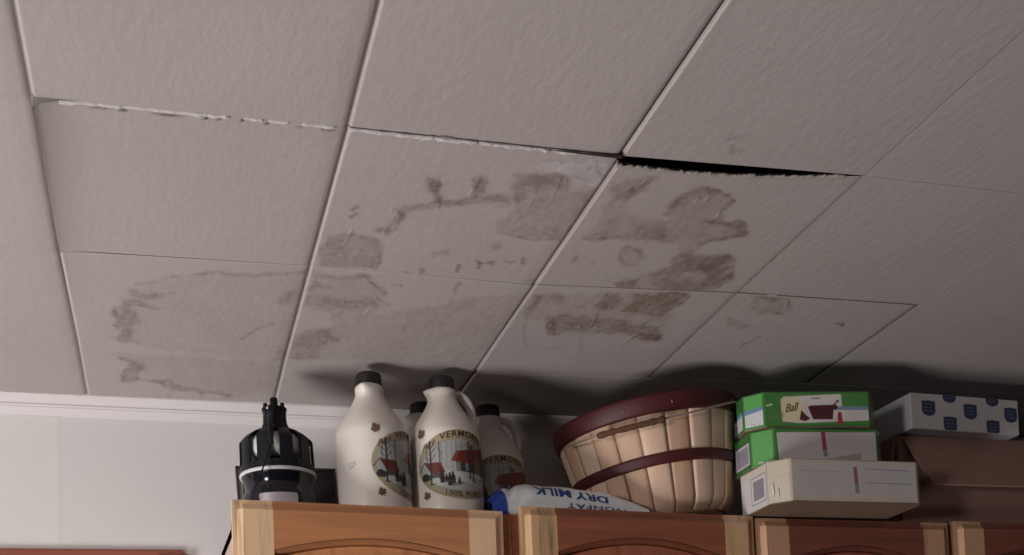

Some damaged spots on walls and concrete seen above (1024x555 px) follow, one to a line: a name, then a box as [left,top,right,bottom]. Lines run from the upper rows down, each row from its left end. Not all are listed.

peeling [239,117,335,132]